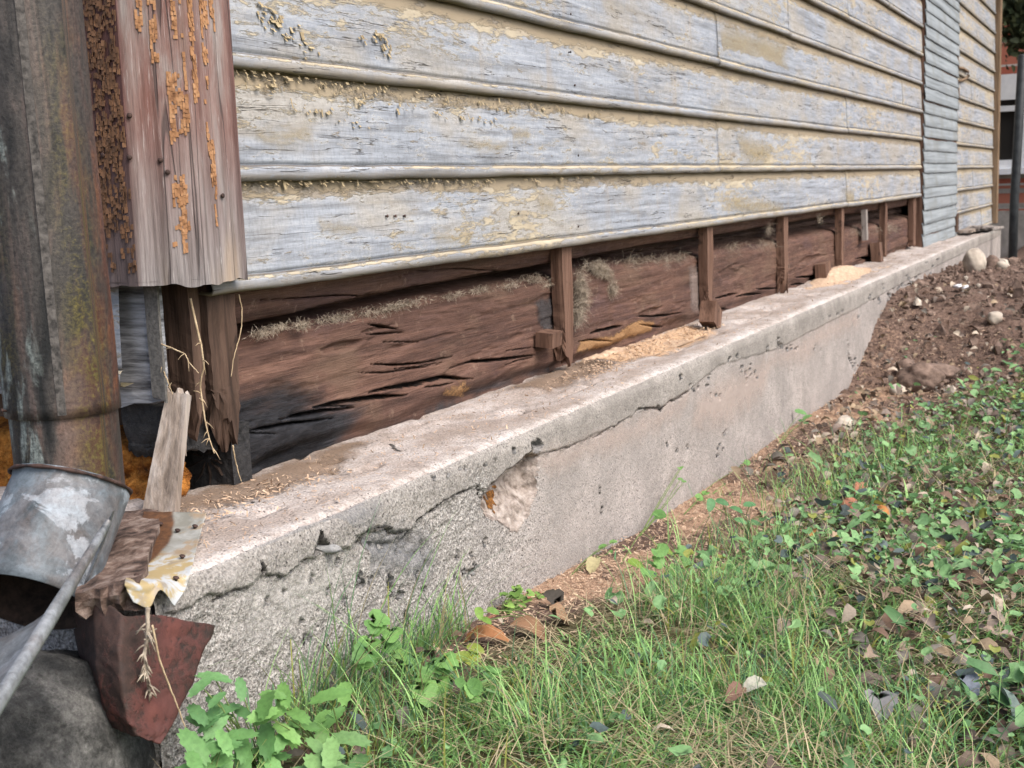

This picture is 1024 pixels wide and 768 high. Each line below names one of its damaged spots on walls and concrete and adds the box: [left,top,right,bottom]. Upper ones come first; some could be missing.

peeling [257,2,320,59]
peeling [134,0,216,145]
peeling [236,69,572,129]
peeling [83,0,137,273]
peeling [172,174,191,254]
crack [716,275,811,310]
crack [578,326,616,342]
crack [298,325,527,415]
crack [546,391,689,453]
crack [374,486,483,535]
spalling [480,439,544,532]
crack [212,558,308,601]